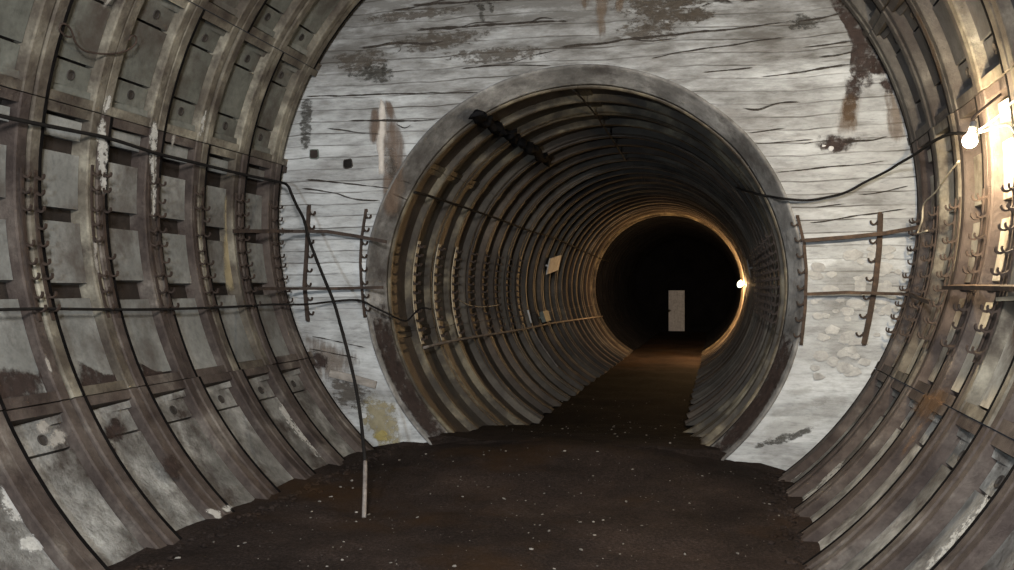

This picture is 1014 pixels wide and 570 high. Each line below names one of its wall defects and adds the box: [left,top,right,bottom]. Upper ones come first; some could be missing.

water stain [335,49,393,83]
water stain [369,0,540,64]
crack [307,0,854,97]
water stain [614,0,716,42]
crack [328,119,435,134]
water stain [376,101,397,178]
crack [745,101,811,144]
crack [302,179,409,201]
water stain [313,353,328,369]
water stain [332,379,370,408]
water stain [714,333,793,451]
water stain [755,428,810,448]